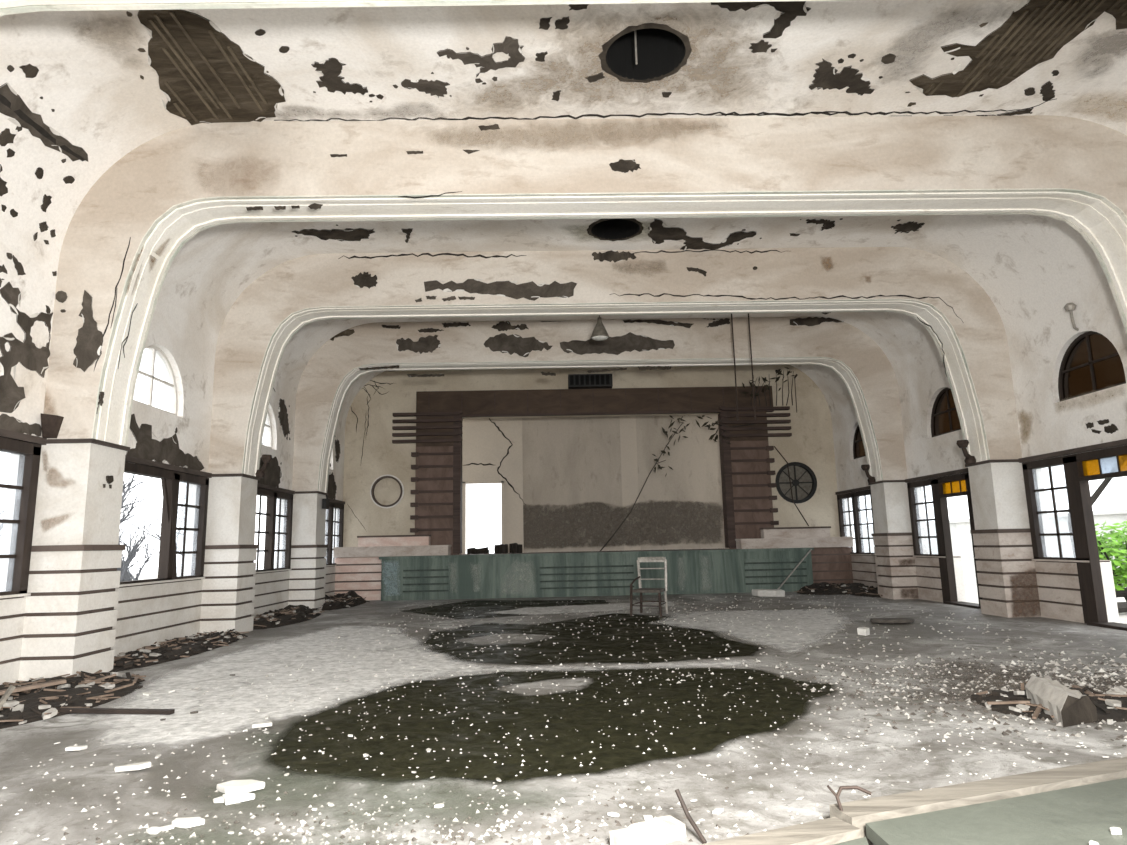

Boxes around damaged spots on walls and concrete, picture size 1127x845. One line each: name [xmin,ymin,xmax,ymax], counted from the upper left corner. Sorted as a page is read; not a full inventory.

spalling [126,9,286,125]
peeling [311,58,452,102]
peeling [437,36,548,85]
water stain [479,15,745,106]
peeling [809,53,896,96]
spalling [905,0,1127,116]
spalling [0,64,88,217]
spalling [415,278,577,302]
peeling [0,253,103,437]
peeling [126,414,204,471]
crack [463,418,526,505]
water stain [104,589,845,827]